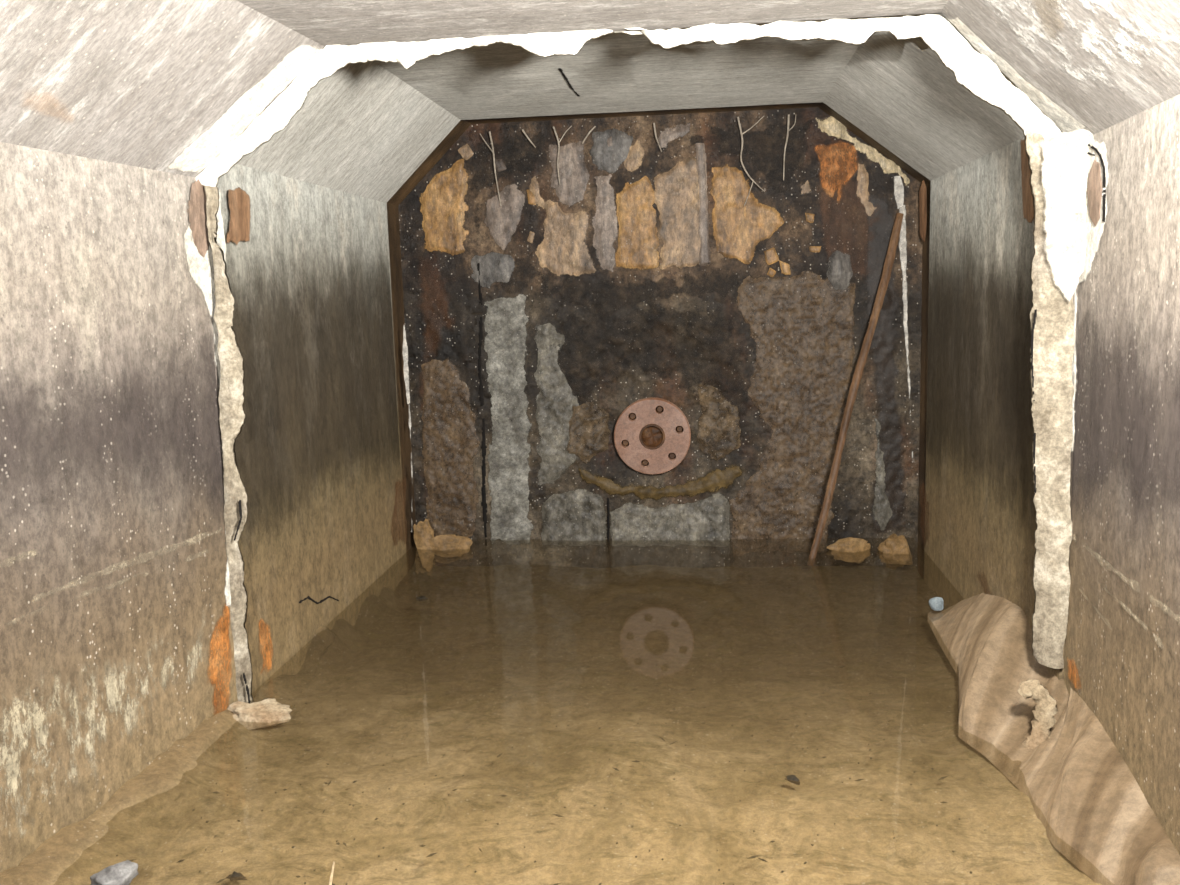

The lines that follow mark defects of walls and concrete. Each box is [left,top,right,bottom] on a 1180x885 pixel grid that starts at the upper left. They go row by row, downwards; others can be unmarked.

spalling [168,14,1109,704]
damp [1072,333,1180,508]
corrosion [208,605,230,715]
corrosion [259,620,273,672]
crack [299,596,339,604]